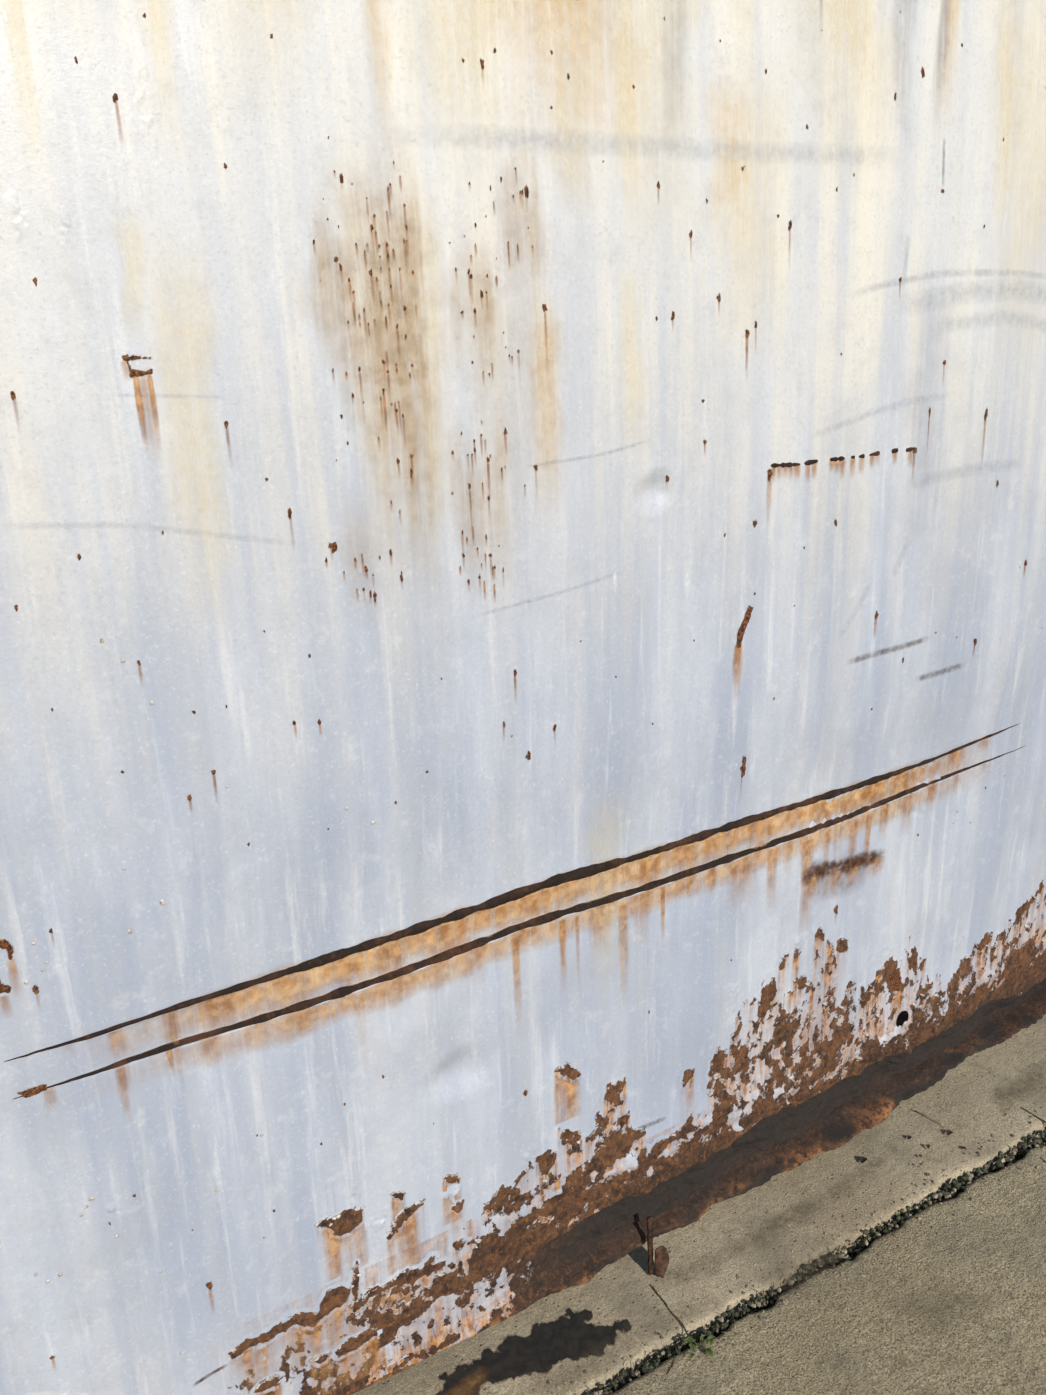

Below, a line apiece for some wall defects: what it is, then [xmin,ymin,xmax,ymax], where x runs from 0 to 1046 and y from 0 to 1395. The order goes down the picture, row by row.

rust [334,161,414,418]
rust [449,216,533,314]
rust [122,354,157,425]
rust [452,420,506,501]
rust [768,447,917,482]
rust [343,549,392,602]
rust [459,526,504,594]
rust [201,766,935,1035]
rust [17,1084,47,1098]
peeling [222,877,1046,1395]